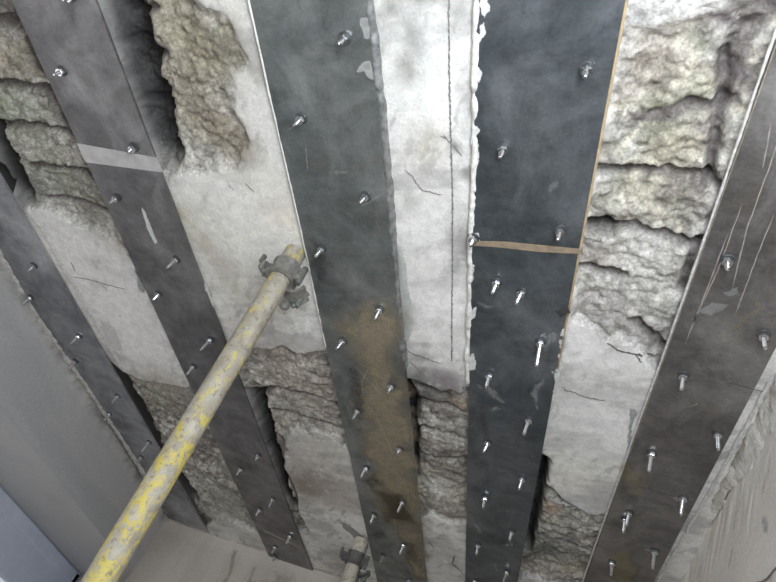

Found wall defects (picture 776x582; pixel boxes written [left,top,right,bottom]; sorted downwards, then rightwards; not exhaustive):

spalling [0,0,137,273]
spalling [122,0,250,183]
spalling [569,0,776,372]
spalling [239,345,348,483]
spalling [288,493,310,532]
rust [339,304,425,579]
spalling [407,378,469,526]
spalling [518,454,607,582]